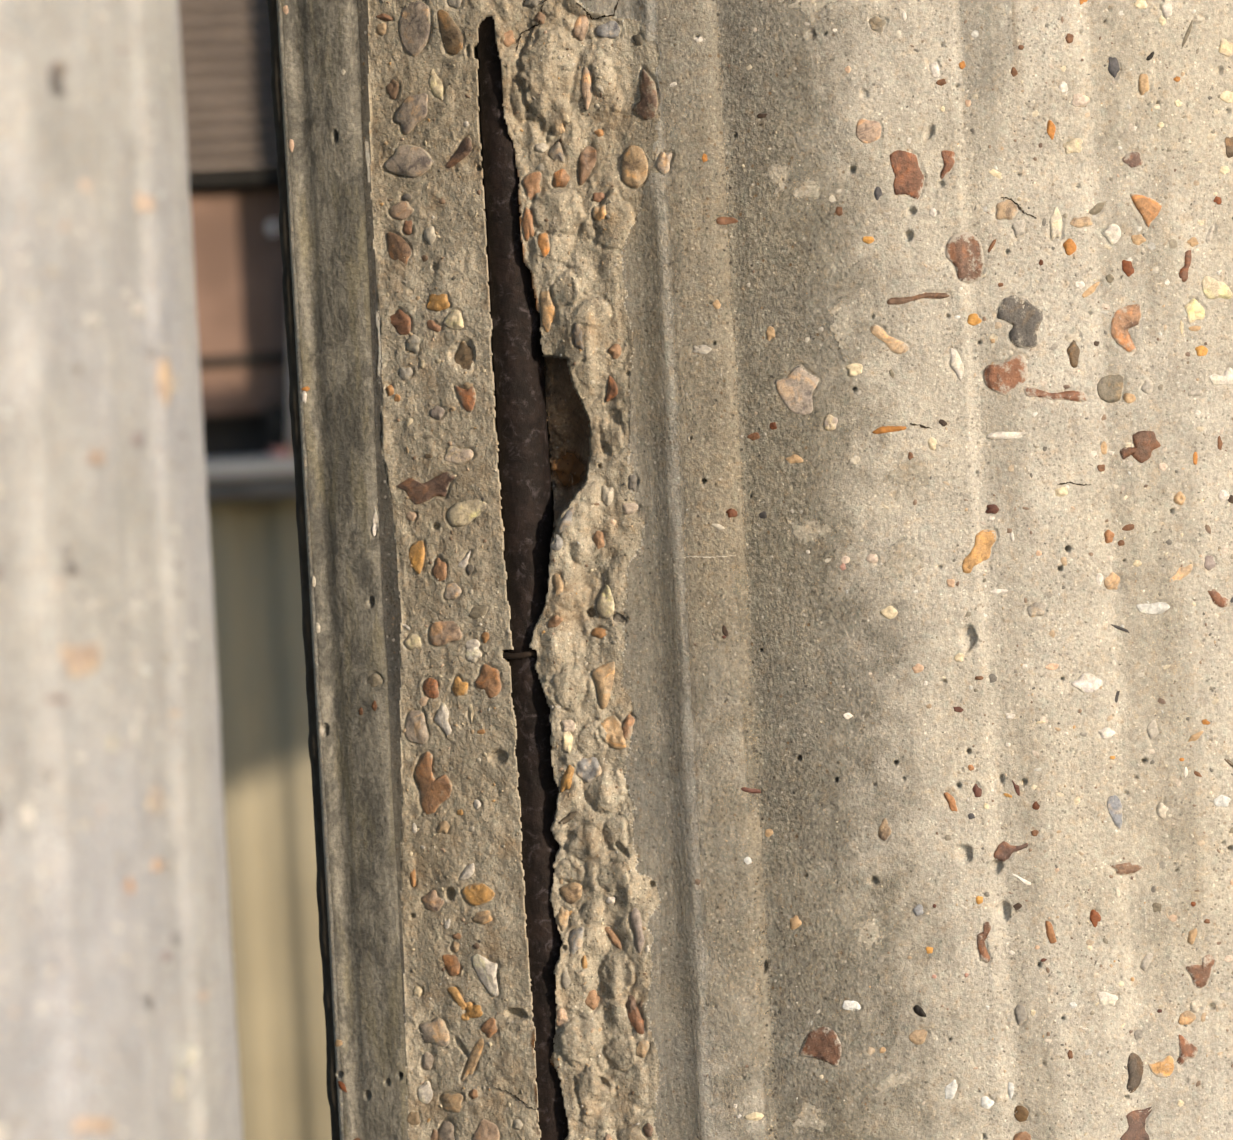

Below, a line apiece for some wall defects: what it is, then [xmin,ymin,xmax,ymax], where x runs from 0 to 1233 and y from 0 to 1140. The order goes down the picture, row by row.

crack [516,0,547,52]
crack [576,0,619,20]
spalling [365,0,672,1140]